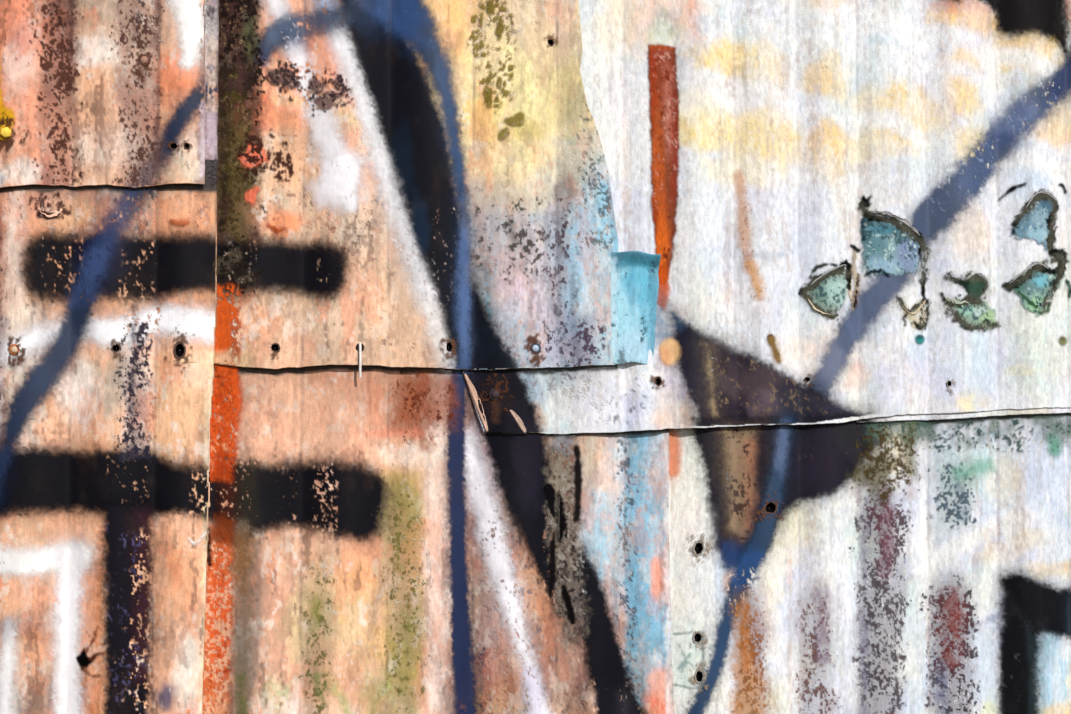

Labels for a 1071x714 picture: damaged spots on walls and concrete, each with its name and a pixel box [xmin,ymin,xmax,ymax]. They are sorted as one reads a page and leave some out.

corrosion [0,0,83,185]
corrosion [110,0,193,186]
corrosion [217,0,285,241]
peeling [799,196,1000,344]
peeling [999,183,1071,316]
corrosion [1,336,26,368]
corrosion [111,322,156,464]
corrosion [164,331,192,371]
corrosion [397,381,455,427]